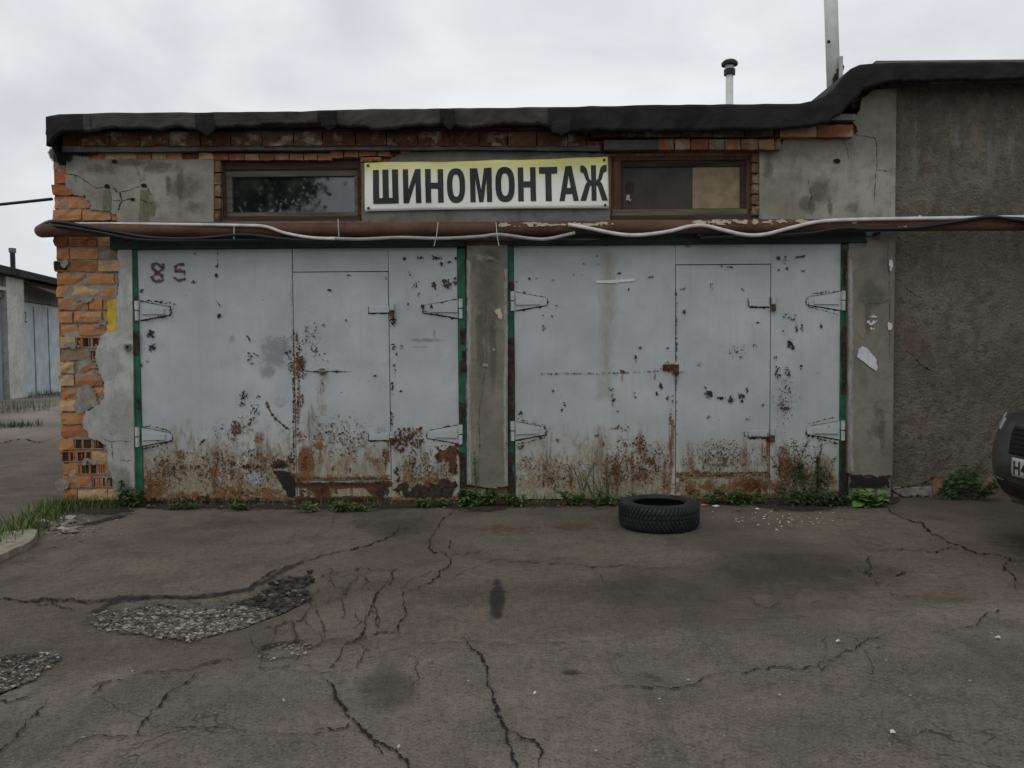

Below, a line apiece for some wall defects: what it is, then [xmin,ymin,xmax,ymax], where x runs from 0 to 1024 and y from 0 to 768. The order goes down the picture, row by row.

crack [69,161,152,214]
spalling [53,237,124,501]
peeling [857,346,878,371]
corrosion [140,427,466,503]
corrosion [508,419,848,499]
spalling [91,561,307,612]